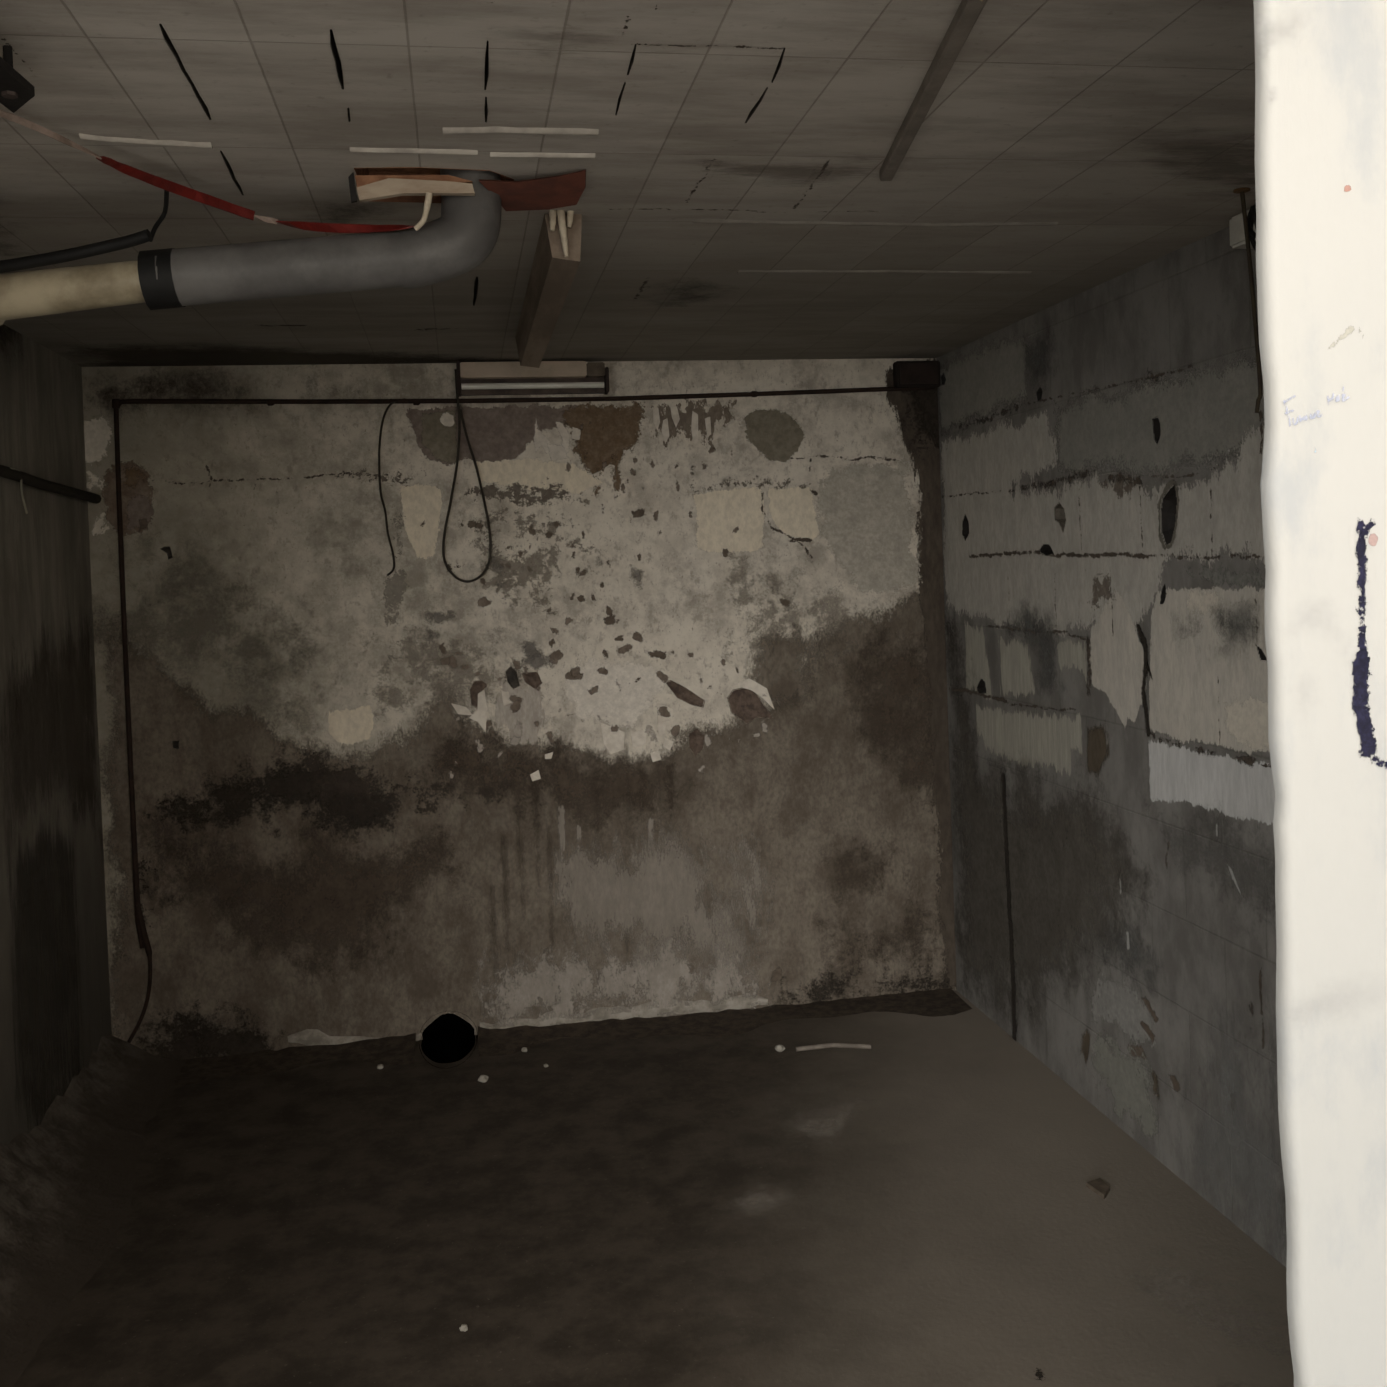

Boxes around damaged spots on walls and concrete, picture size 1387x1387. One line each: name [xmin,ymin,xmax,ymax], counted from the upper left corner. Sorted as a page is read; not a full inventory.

peeling [406,403,583,466]
peeling [651,399,737,491]
spalling [1152,417,1161,443]
spalling [505,514,561,571]
peeling [630,508,662,534]
spalling [1039,544,1054,556]
spalling [1054,502,1066,532]
spalling [1157,480,1179,550]
peeling [439,531,775,781]
peeling [1089,589,1147,727]
water stain [4,368,1147,1126]